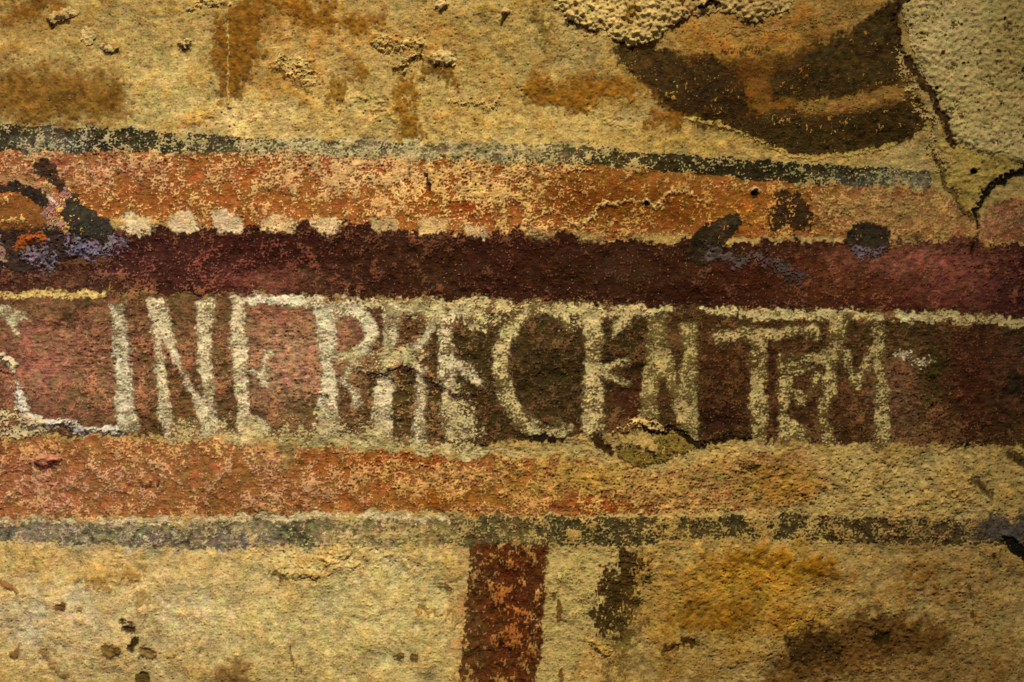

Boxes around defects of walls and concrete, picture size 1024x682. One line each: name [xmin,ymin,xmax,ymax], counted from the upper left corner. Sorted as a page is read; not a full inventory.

crack [891,0,1024,255]
flaking render [617,430,693,468]